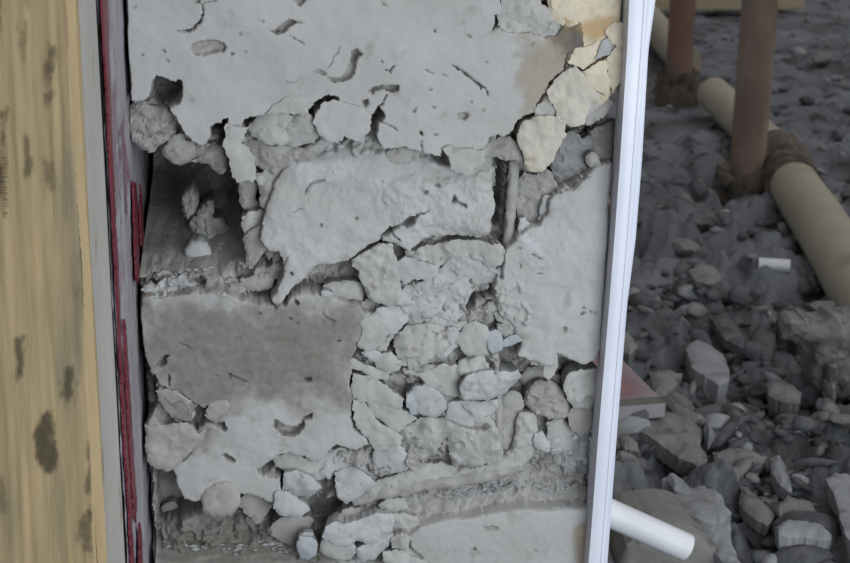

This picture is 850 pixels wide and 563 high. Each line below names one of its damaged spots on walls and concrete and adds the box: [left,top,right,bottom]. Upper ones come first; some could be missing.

crack [178,0,217,32]
spalling [189,39,228,57]
spalling [312,47,365,83]
crack [425,65,488,94]
spalling [492,0,578,47]
leakage [520,32,571,103]
leakage [540,0,561,13]
leakage [575,0,621,71]
spalling [443,22,623,245]
spalling [129,75,439,352]
spalling [144,353,597,563]